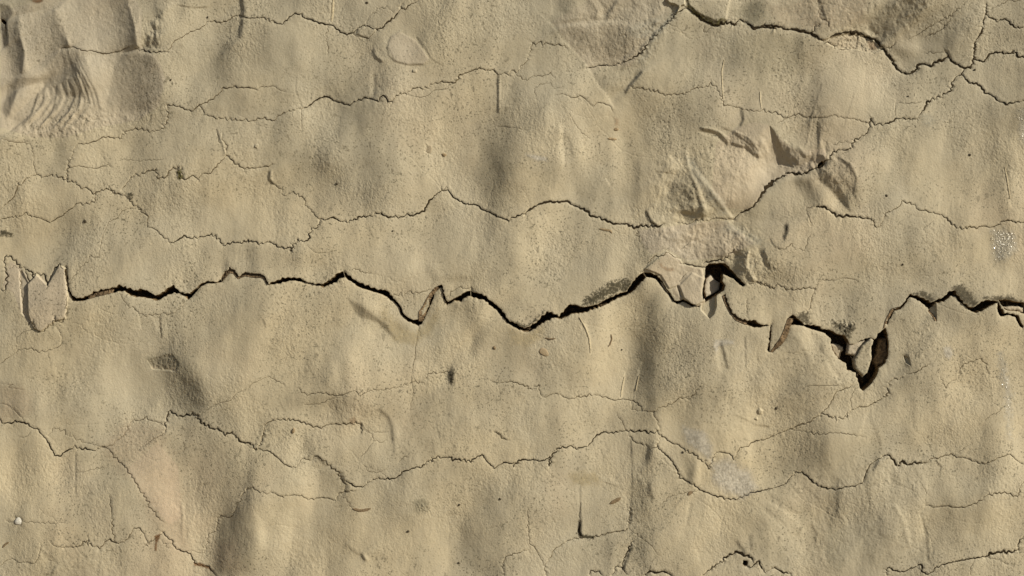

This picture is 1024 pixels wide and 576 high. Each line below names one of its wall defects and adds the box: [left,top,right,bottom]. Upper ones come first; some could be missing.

crack [0,0,1024,409]
flaking render [3,261,67,331]
flaking render [639,221,754,307]
spalling [824,327,889,391]
crack [0,366,1023,575]